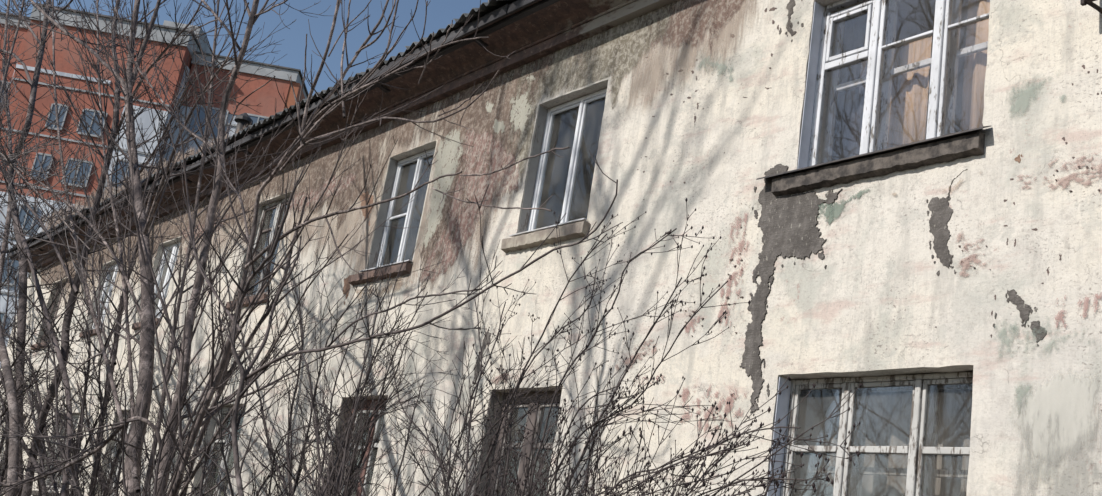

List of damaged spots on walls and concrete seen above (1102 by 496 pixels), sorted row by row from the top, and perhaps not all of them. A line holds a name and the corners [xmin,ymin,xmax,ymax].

spalling [764,0,804,42]
damp [40,0,752,299]
spalling [926,195,991,277]
spalling [678,163,843,432]
spalling [990,289,1066,347]
peeling [1078,292,1102,324]